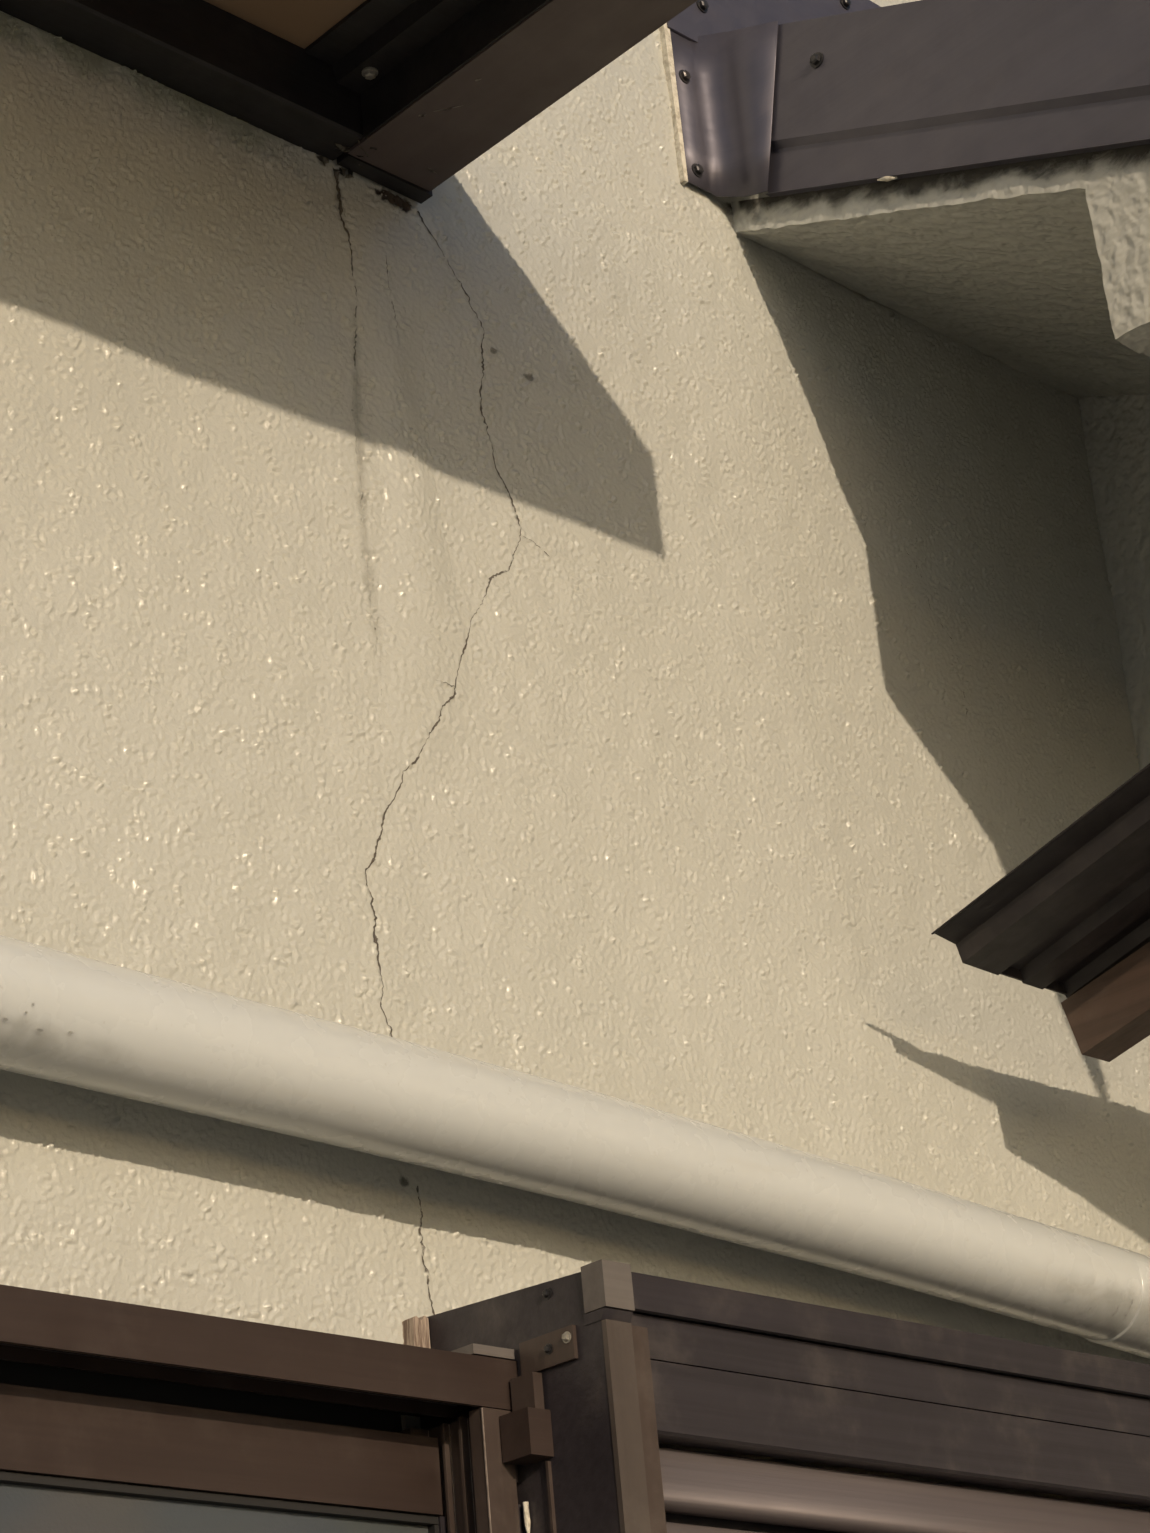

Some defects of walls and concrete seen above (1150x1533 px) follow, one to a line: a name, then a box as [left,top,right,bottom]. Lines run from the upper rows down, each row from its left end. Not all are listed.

crack [333,168,398,365]
crack [365,211,549,1037]
crack [416,1186,435,1315]